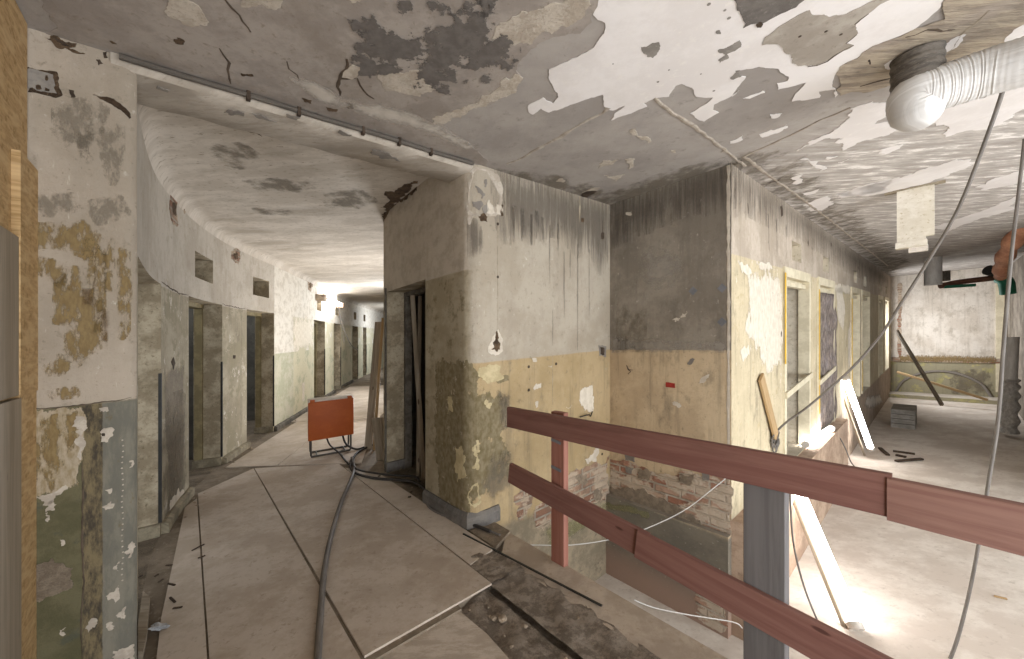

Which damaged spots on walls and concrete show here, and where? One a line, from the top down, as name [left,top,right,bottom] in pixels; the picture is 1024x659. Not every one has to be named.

leakage [51,97,122,175]
crack [219,48,231,84]
crack [336,59,374,99]
peeling [42,0,1024,231]
leakage [38,194,73,217]
leakage [263,178,300,191]
leakage [336,191,367,209]
leakage [506,177,606,255]
peeling [722,135,783,444]
peeling [434,330,510,512]
peeling [36,407,88,522]
flaking render [568,448,734,535]